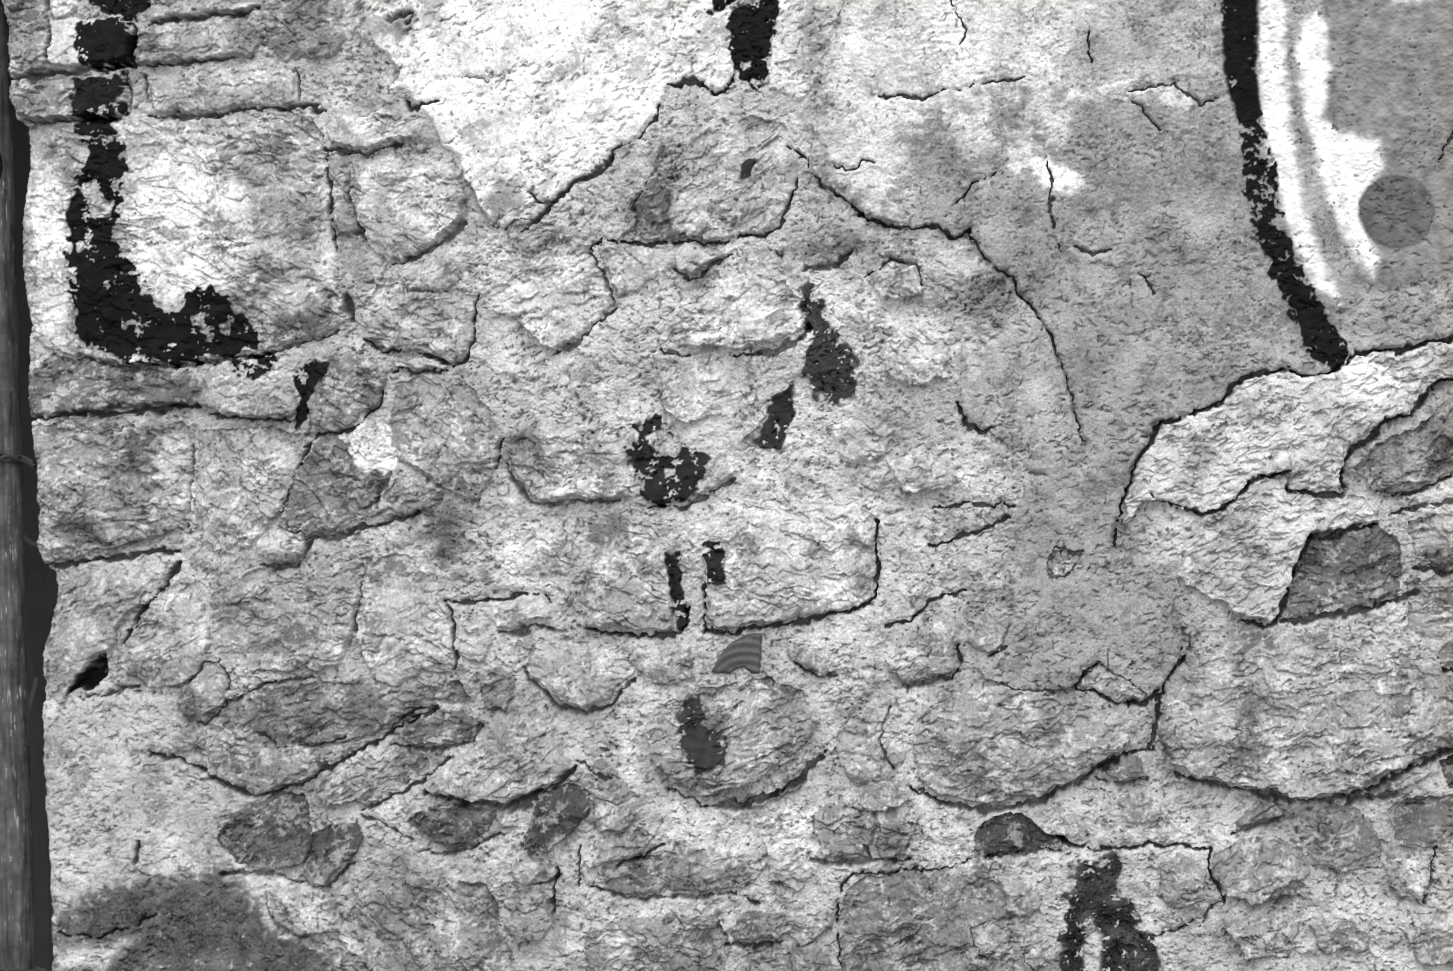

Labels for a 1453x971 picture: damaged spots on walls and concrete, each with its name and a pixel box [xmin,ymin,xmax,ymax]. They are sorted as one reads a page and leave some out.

crack [950,0,968,45]
crack [1086,30,1094,63]
crack [878,76,1027,102]
crack [1128,83,1221,132]
crack [521,75,735,234]
crack [1046,162,1156,296]
crack [591,146,1087,443]
crack [1112,334,1453,630]
peeling [1122,342,1453,624]
crack [928,501,1017,549]
spalling [1047,546,1085,580]
spalling [66,653,110,696]